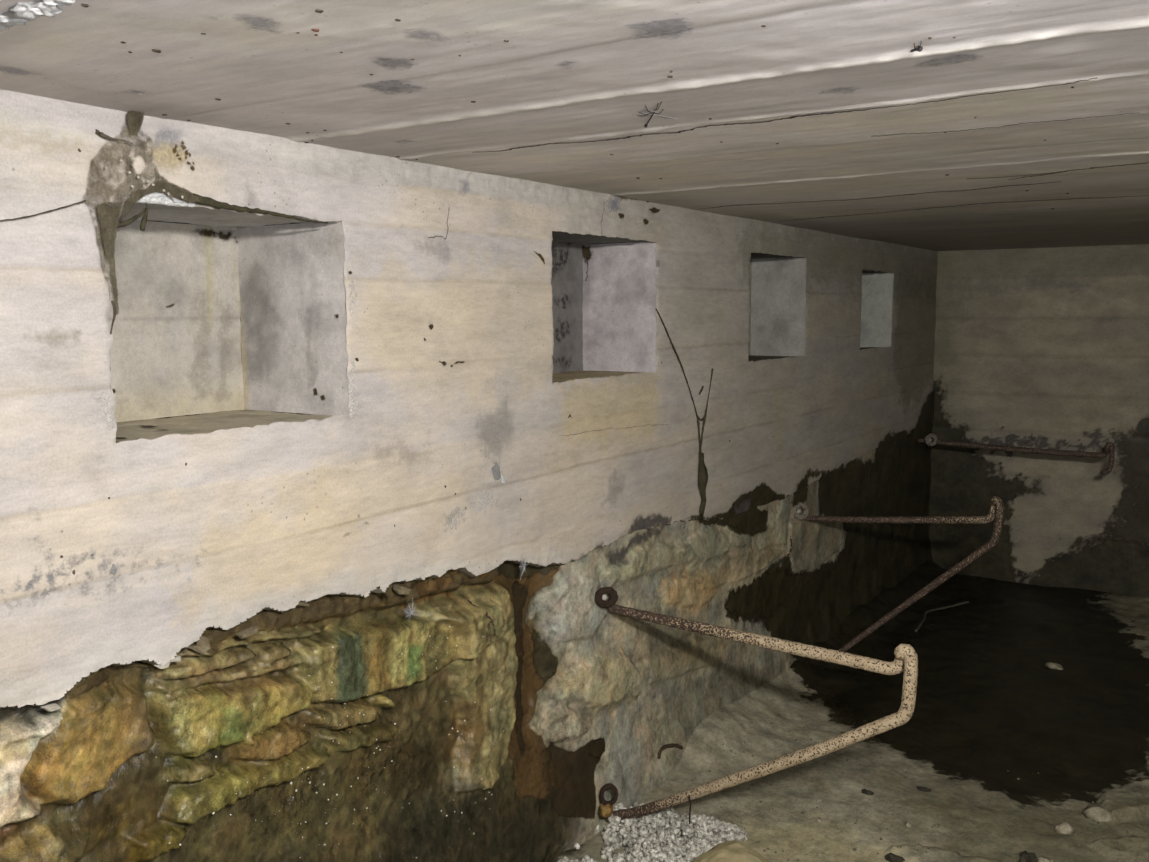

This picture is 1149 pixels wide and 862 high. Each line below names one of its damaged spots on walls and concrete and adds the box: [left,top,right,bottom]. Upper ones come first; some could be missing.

crack [487,78,1139,152]
spalling [127,192,195,207]
damp [571,514,671,566]
damp [683,381,1149,808]
spalling [71,568,499,698]